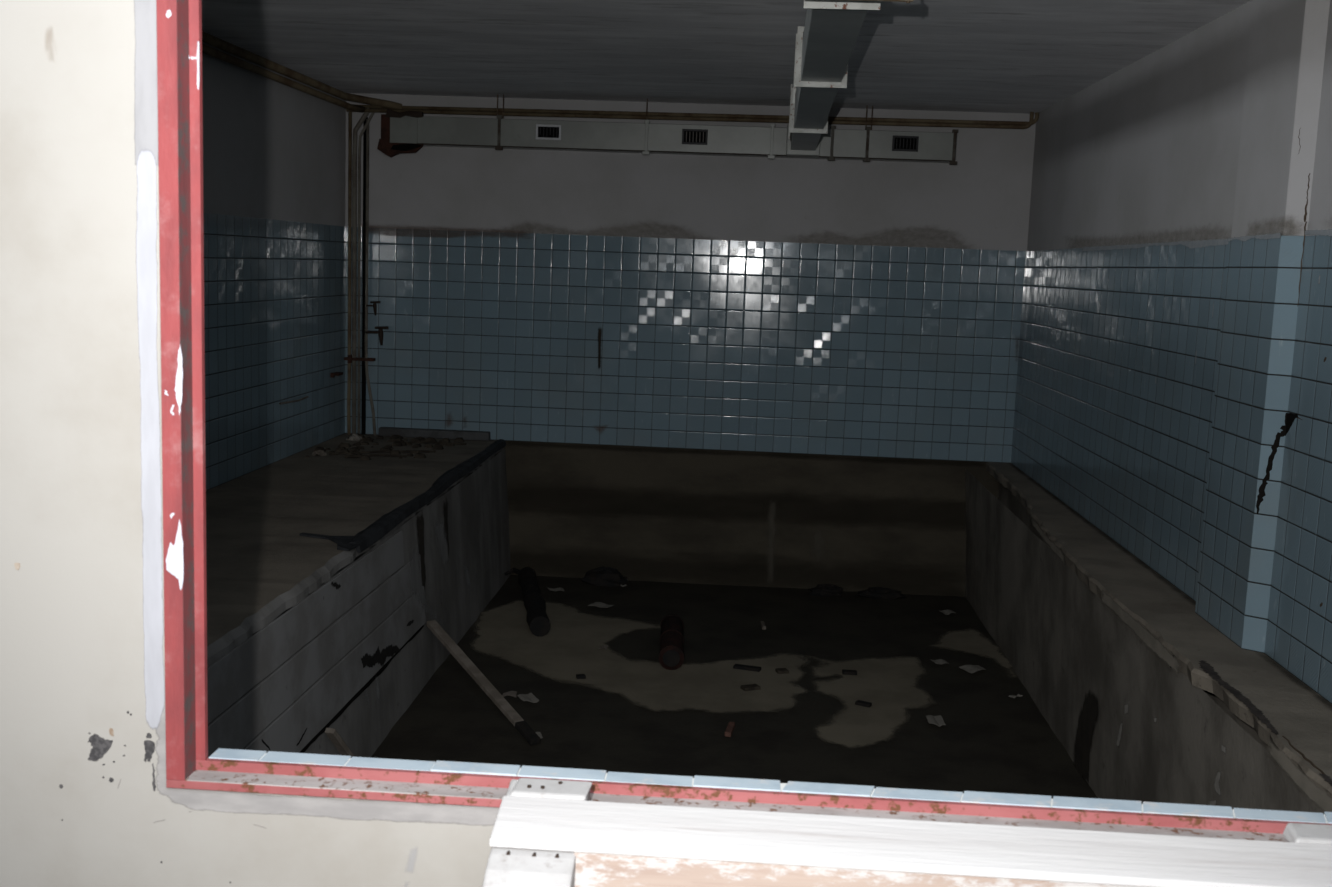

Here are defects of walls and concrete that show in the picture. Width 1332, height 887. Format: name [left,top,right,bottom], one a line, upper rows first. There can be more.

peeling [189,41,200,90]
peeling [165,344,183,415]
crack [1256,413,1302,514]
peeling [166,513,184,591]
spalling [88,728,126,782]
spalling [144,732,155,762]